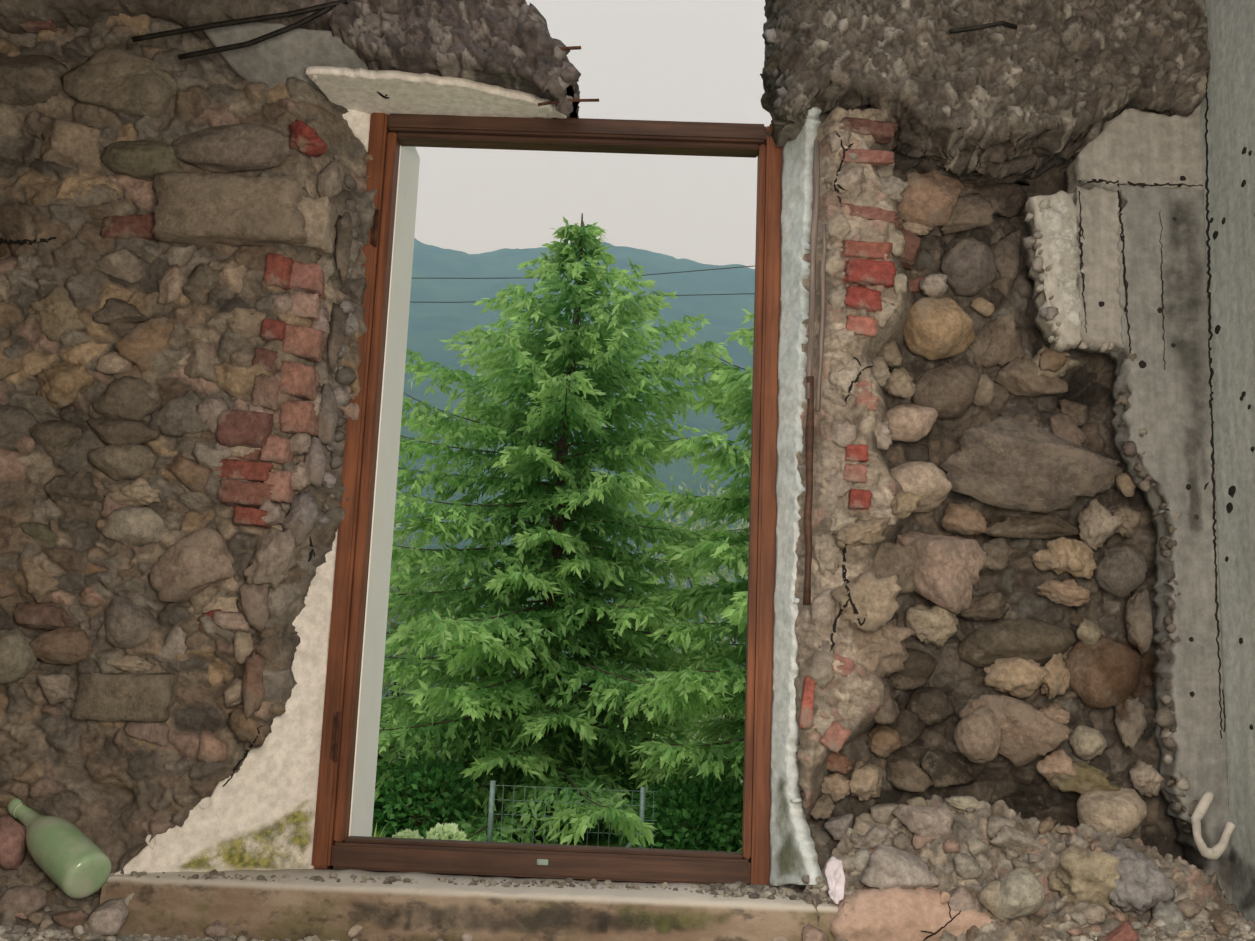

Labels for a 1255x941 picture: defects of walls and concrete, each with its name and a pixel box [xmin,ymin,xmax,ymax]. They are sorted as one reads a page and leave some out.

crack [0,237,56,245]
spalling [1022,198,1137,361]
peeling [114,267,359,875]
peeling [769,107,824,886]
spalling [1114,390,1199,663]
water stain [286,810,310,824]
spalling [1151,678,1198,833]